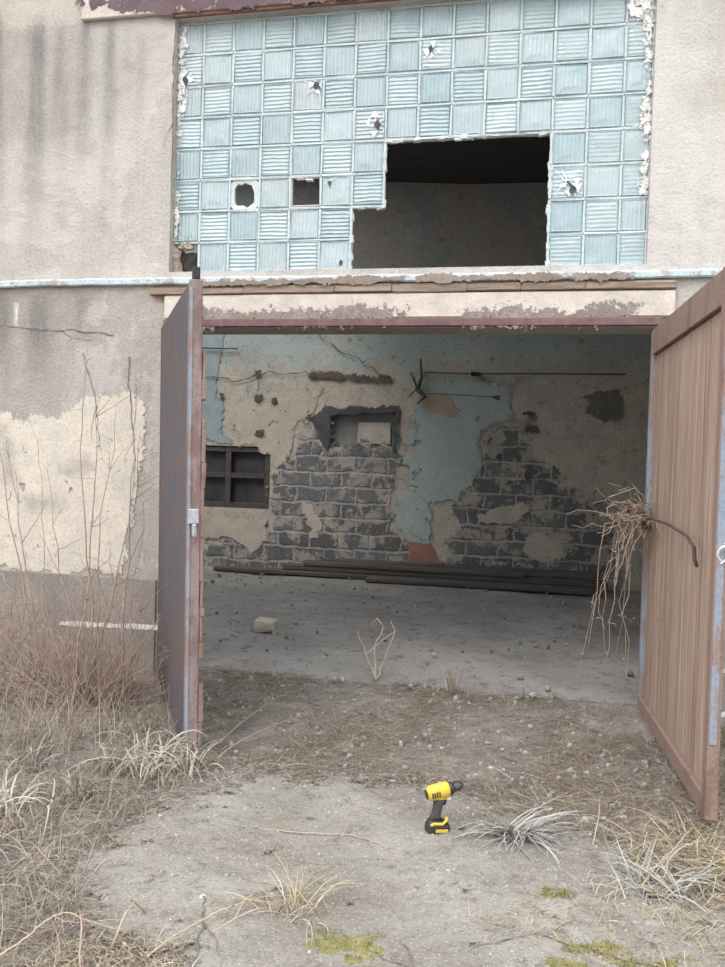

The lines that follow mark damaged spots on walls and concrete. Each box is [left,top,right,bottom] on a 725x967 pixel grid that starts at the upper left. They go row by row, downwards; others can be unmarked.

peeling [75,0,352,17]
peeling [176,25,189,179]
peeling [620,0,656,197]
spalling [172,191,194,272]
peeling [203,131,634,287]
crack [0,317,114,453]
flaking render [0,389,147,576]
crack [124,357,136,537]
flaking render [202,299,644,590]